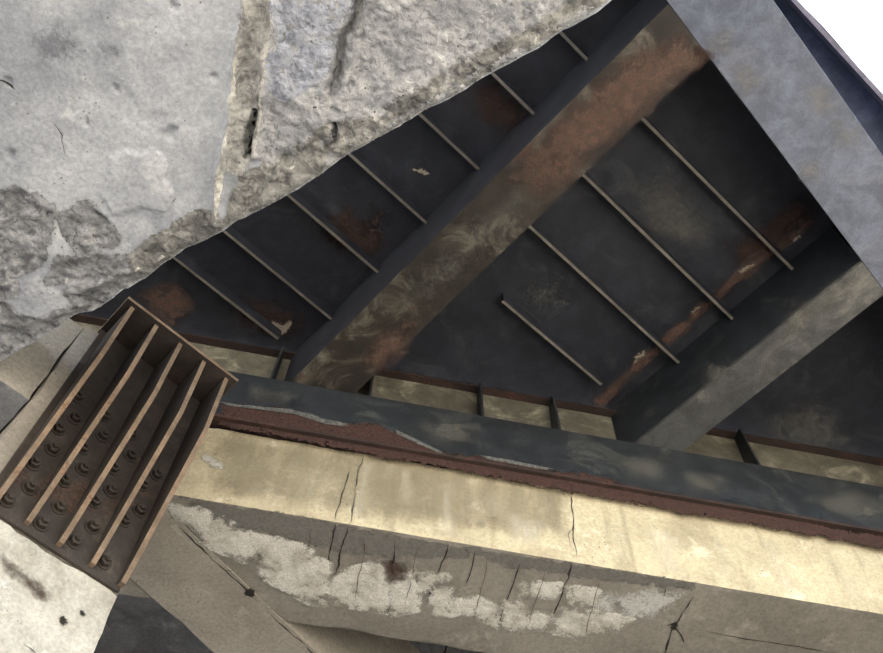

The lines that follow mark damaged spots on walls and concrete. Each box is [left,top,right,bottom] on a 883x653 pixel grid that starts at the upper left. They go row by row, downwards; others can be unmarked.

spalling [0,0,607,360]
corrosion [511,35,712,198]
corrosion [363,323,413,368]
crack [328,456,364,574]
water stain [167,496,696,639]
crack [426,547,448,603]
crack [498,562,521,625]
corrosion [218,402,883,549]
crack [545,494,577,630]
crack [661,588,832,653]